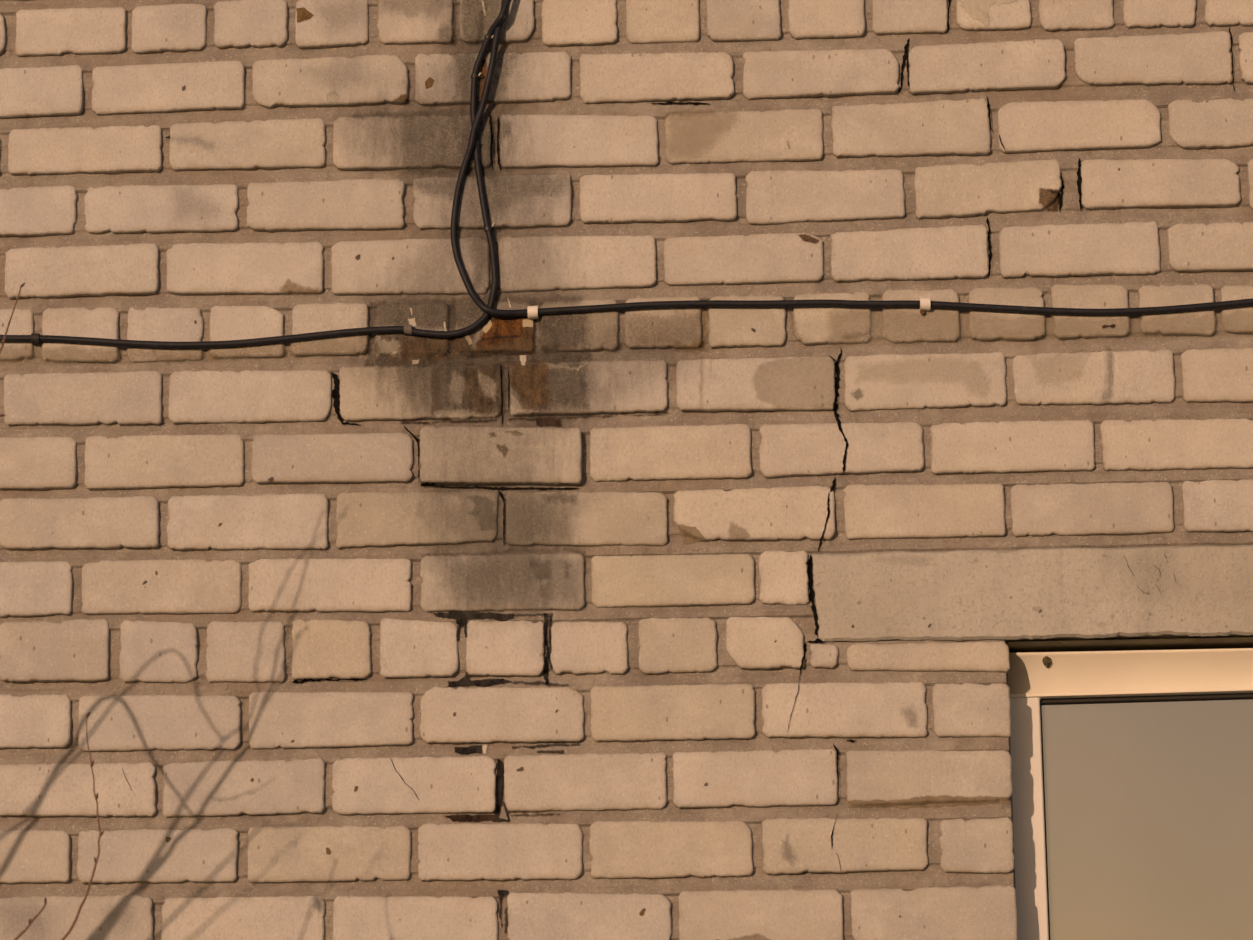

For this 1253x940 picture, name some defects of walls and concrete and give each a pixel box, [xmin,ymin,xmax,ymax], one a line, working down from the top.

crack [897,39,909,95]
leakage [480,115,493,175]
crack [987,98,1006,151]
crack [1059,158,1082,213]
crack [985,218,993,279]
rust [466,315,536,358]
crack [331,372,359,425]
crack [500,366,510,424]
crack [403,425,579,544]
crack [787,348,848,732]